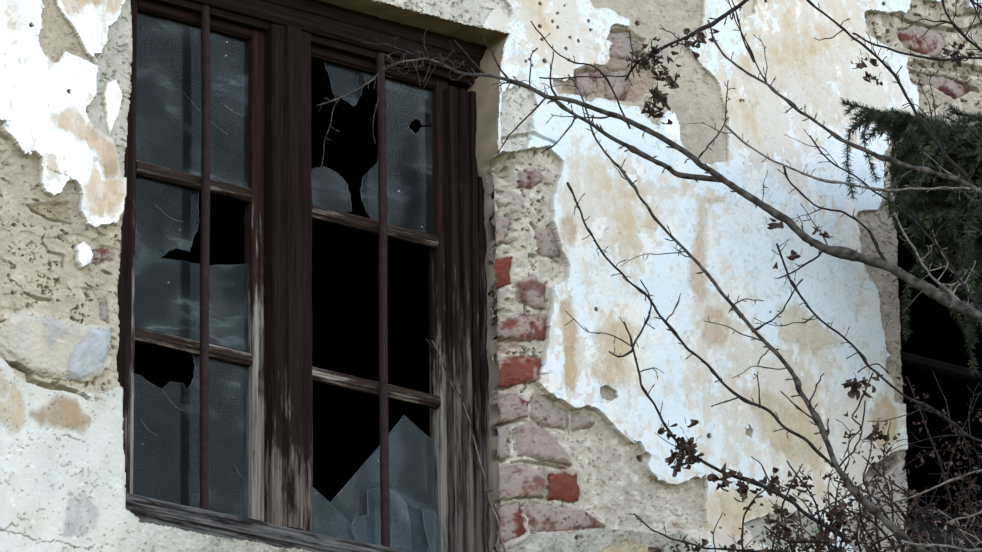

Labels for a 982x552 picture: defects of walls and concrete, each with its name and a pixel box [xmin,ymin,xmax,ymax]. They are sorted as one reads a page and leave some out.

spalling [29,0,133,179]
spalling [538,0,731,164]
flaking render [864,0,982,128]
spalling [0,113,126,394]
flaking render [481,80,709,552]
spalling [856,139,903,404]